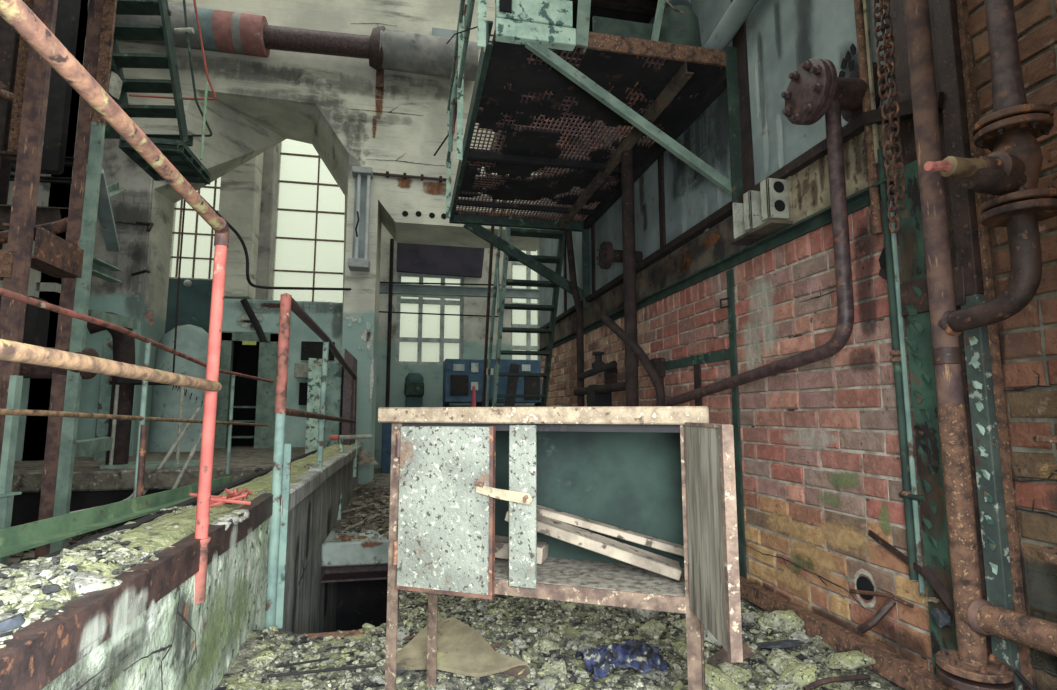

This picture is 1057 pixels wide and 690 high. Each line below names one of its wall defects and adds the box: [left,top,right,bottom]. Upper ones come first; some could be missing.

rust [372,90,384,137]
peeling [905,286,945,570]
peeling [969,336,993,503]
peeling [988,538,998,575]
water stain [1020,558,1057,622]
water stain [55,633,141,690]
water stain [176,593,193,682]
water stain [1029,648,1057,675]